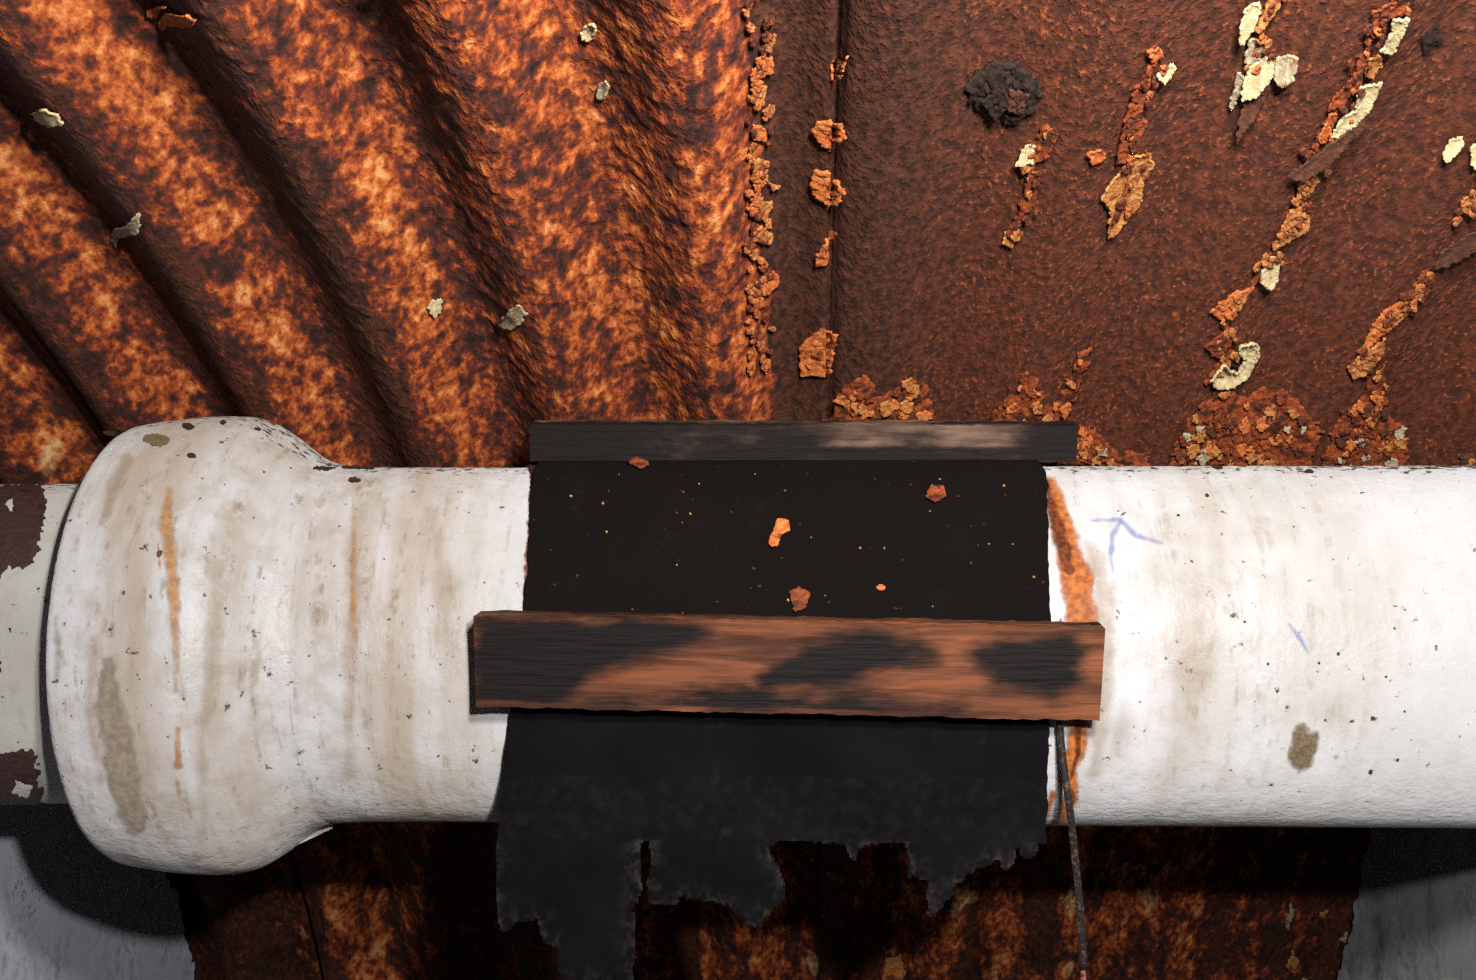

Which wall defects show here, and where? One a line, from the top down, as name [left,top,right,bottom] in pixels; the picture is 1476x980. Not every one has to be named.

corrosion [742,0,781,377]
corrosion [808,169,846,210]
corrosion [810,119,847,152]
peeling [1203,0,1415,390]
peeling [1442,136,1476,170]
peeling [1347,189,1476,412]
corrosion [799,327,936,421]
corrosion [1168,377,1410,466]
peeling [0,482,47,578]
corrosion [990,347,1150,622]
peeling [0,749,45,805]
peeling [98,659,145,832]